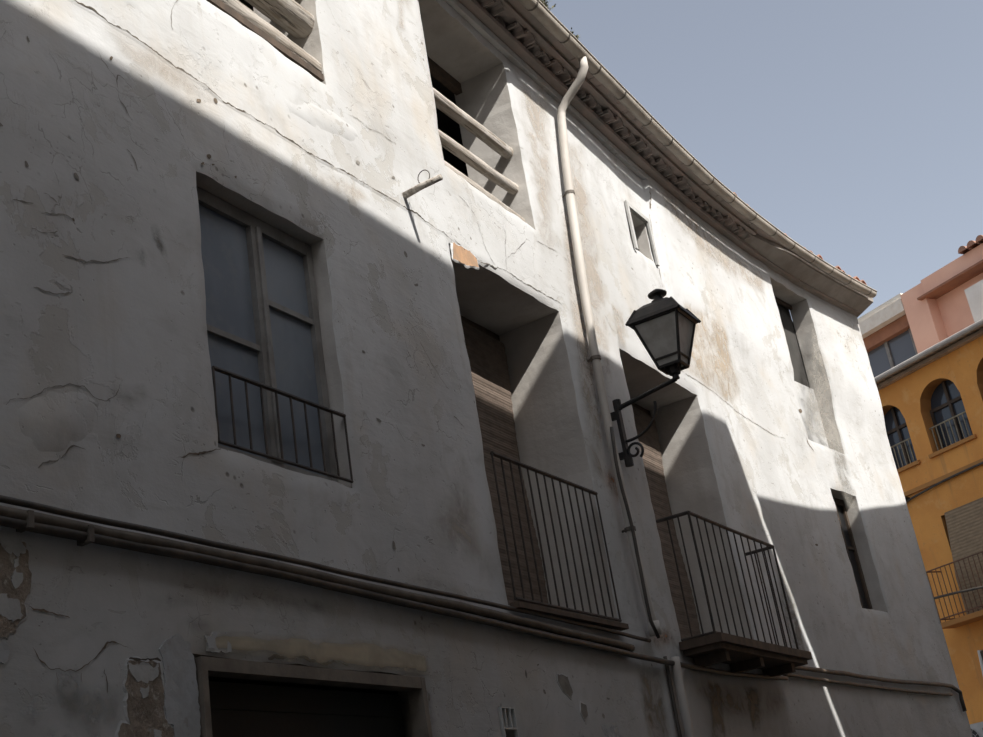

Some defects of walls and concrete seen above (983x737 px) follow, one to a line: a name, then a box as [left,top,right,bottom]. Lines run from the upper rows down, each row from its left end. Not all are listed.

crack [67,0,572,303]
spalling [450,242,479,269]
crack [6,383,120,405]
crack [38,445,86,468]
spalling [0,527,33,640]
crack [33,641,129,693]
spalling [115,656,174,737]
spalling [556,673,588,722]